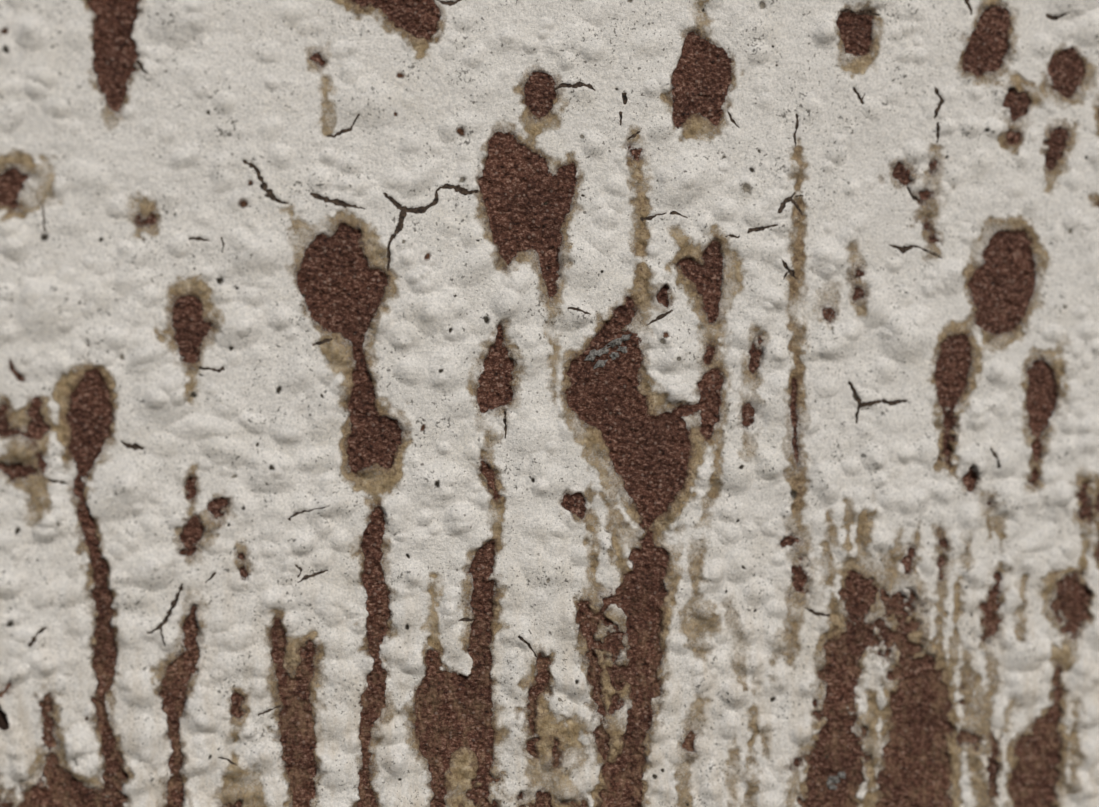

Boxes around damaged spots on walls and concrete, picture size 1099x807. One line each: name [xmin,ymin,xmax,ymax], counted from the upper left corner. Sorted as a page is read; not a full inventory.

crack [242,160,479,272]
crack [848,381,908,424]